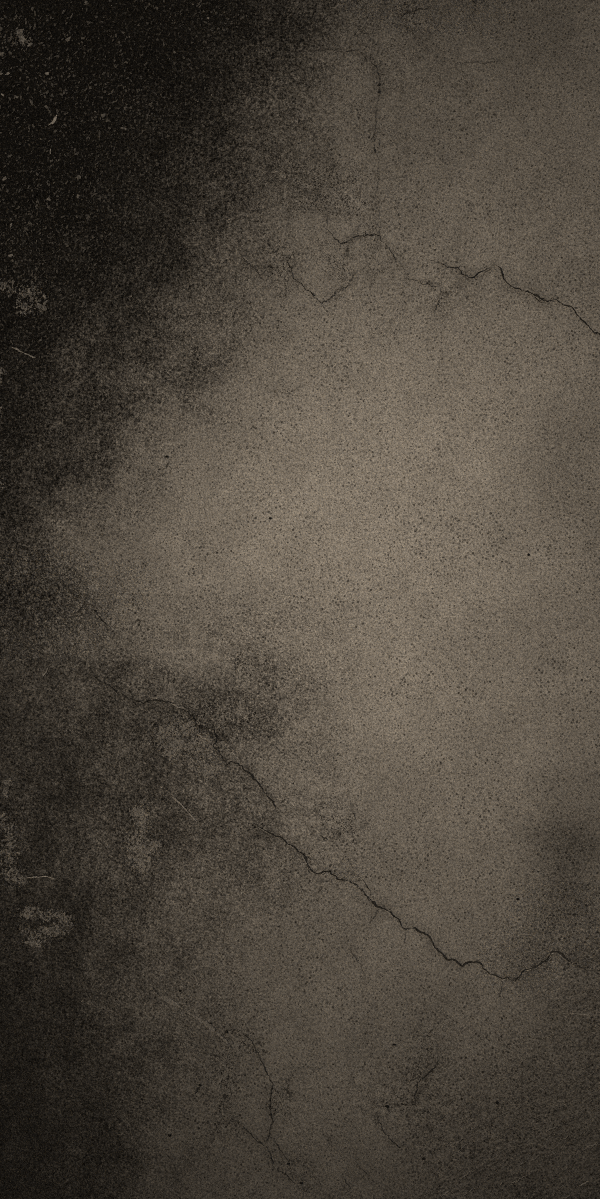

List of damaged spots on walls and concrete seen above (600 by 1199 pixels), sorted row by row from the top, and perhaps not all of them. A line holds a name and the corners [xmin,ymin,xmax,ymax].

crack [241,188,600,336]
crack [91,670,599,995]